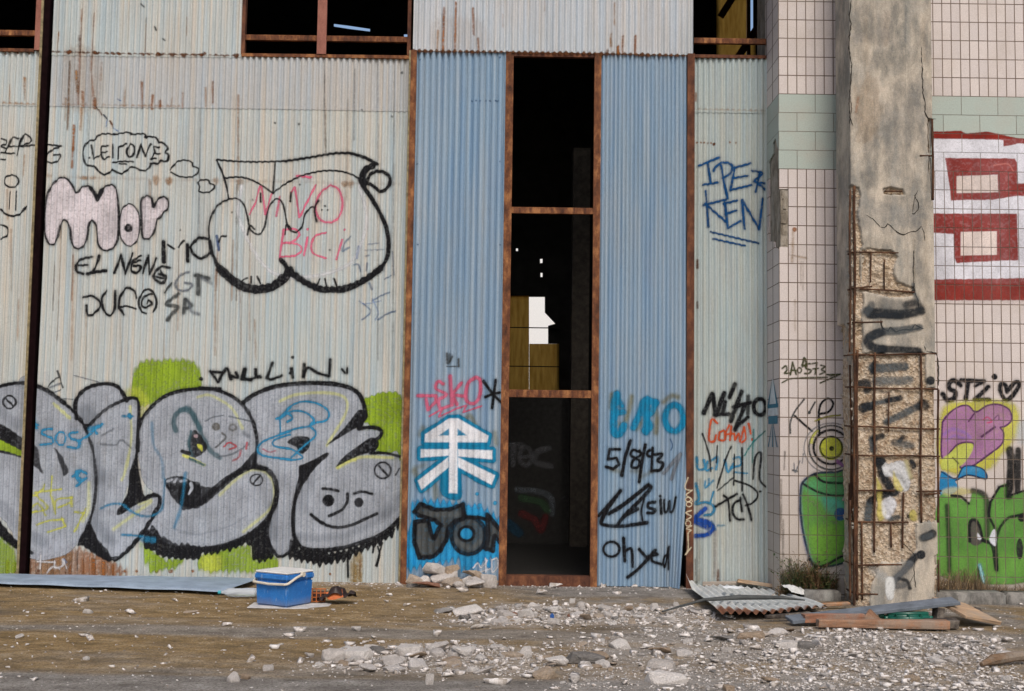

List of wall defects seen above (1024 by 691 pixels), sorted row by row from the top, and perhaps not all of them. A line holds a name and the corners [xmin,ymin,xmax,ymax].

corrosion [52,50,239,168]
crack [867,191,925,297]
spalling [840,186,942,606]
corrosion [30,548,138,576]